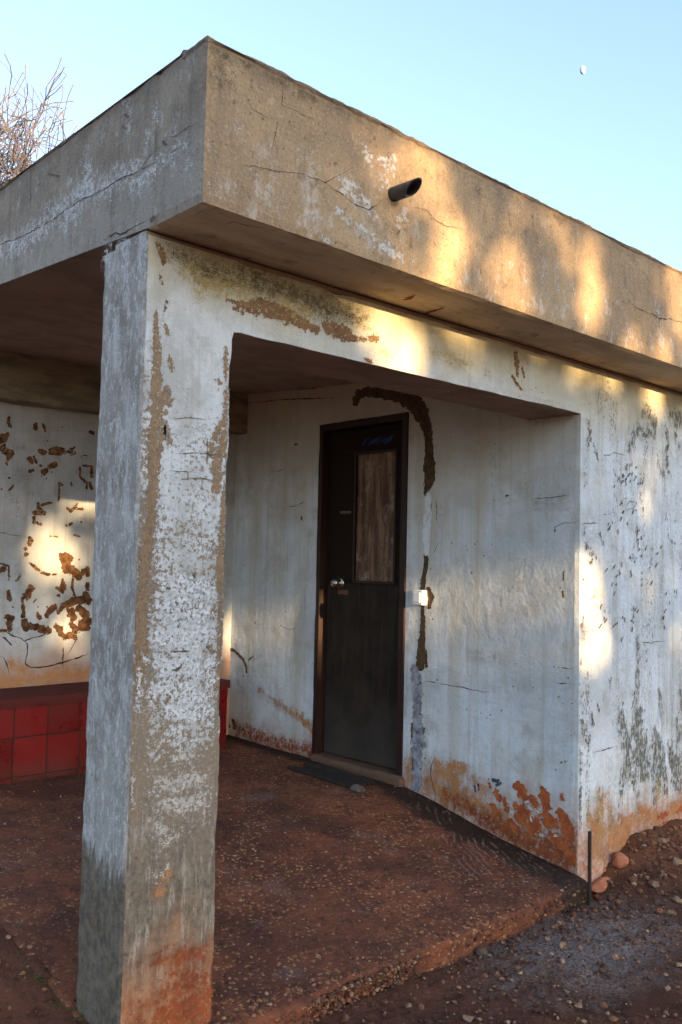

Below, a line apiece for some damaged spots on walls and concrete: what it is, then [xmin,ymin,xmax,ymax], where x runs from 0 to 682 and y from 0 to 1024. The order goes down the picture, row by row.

crack [0,121,199,245]
crack [246,83,383,210]
damp [0,59,393,457]
peeling [225,297,380,343]
peeling [352,386,436,496]
crack [1,630,87,676]
peeling [0,415,94,645]
peeling [131,310,254,886]
damp [403,732,682,873]
peeling [488,605,682,864]